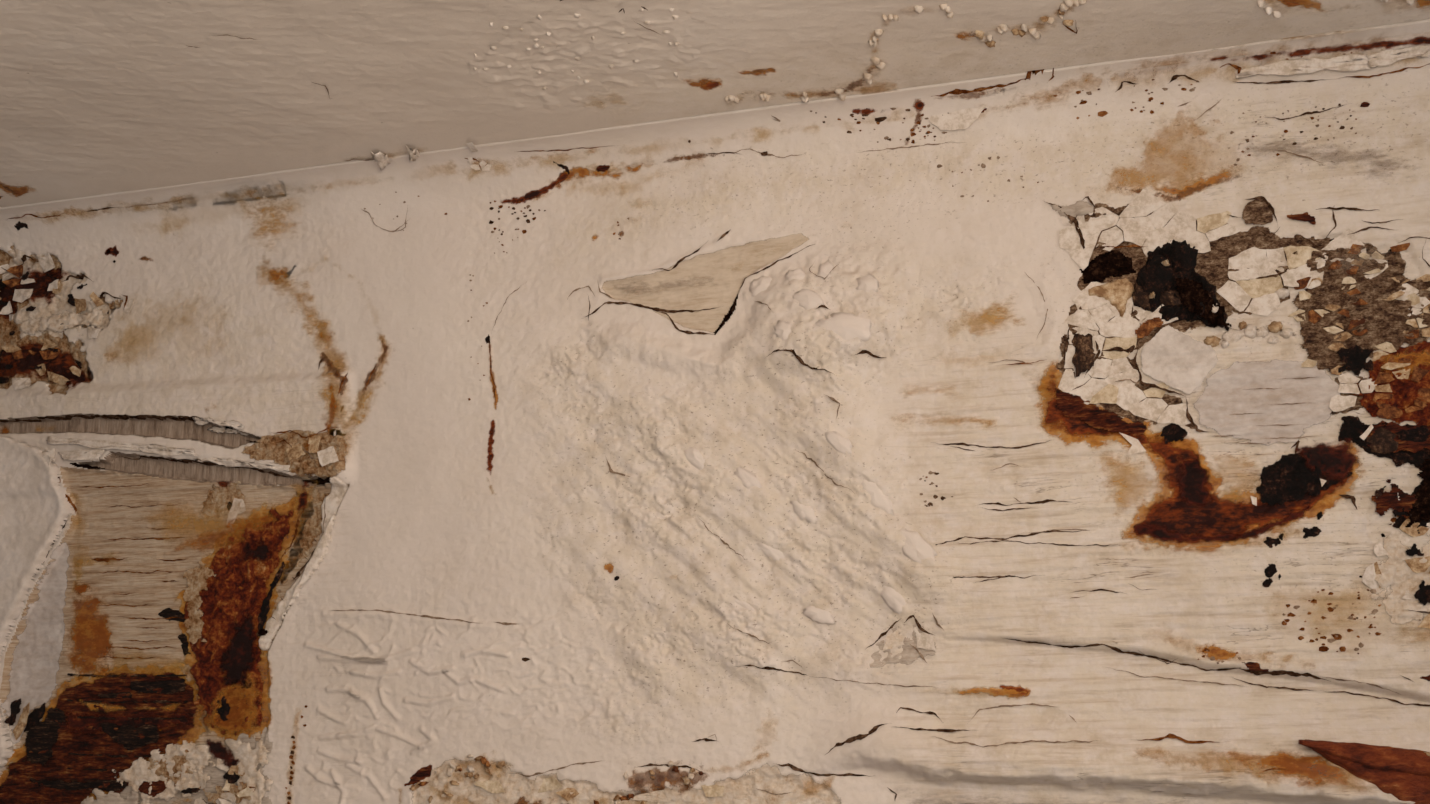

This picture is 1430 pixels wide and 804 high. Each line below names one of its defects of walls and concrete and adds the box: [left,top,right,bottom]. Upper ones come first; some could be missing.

corrosion [489,146,641,254]
water stain [1114,102,1370,201]
spalling [0,245,134,395]
peeling [569,230,811,335]
corrosion [1037,363,1360,552]
crack [935,440,1156,598]
spalling [0,427,350,804]
corrosion [165,481,313,741]
crack [736,660,1098,755]
crack [1005,638,1430,706]
spalling [404,754,870,804]
corrosion [1131,733,1430,804]